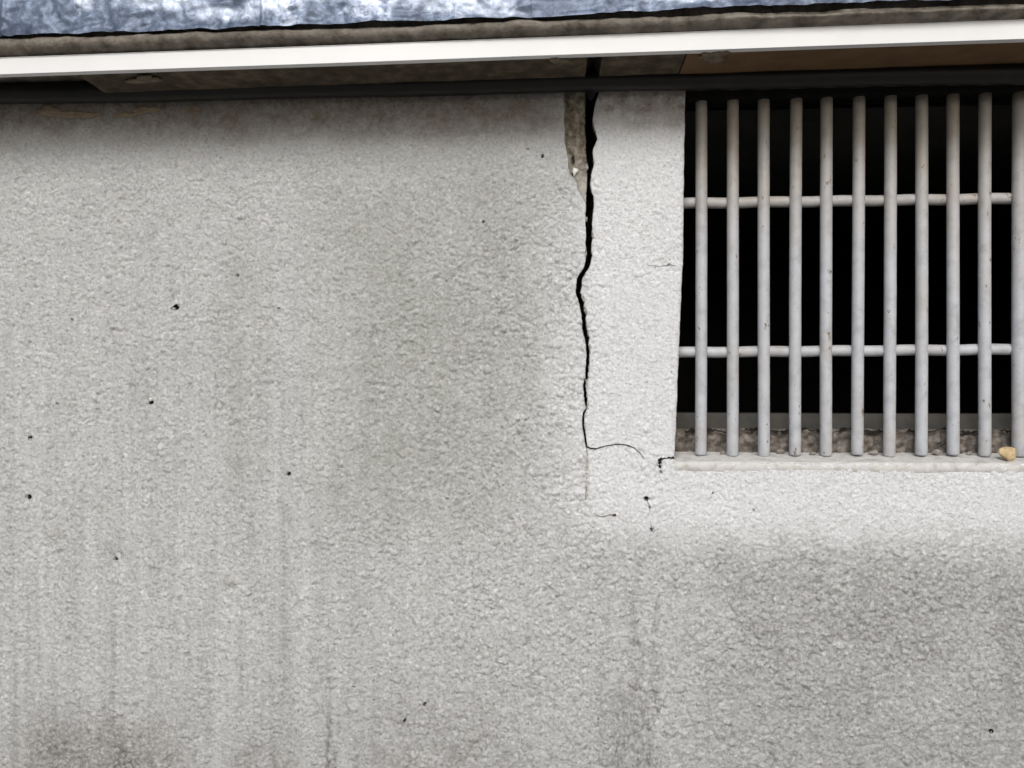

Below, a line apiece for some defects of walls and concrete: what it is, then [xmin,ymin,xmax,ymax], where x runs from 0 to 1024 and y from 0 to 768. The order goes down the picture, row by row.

spalling [563,92,587,202]
crack [576,57,644,518]